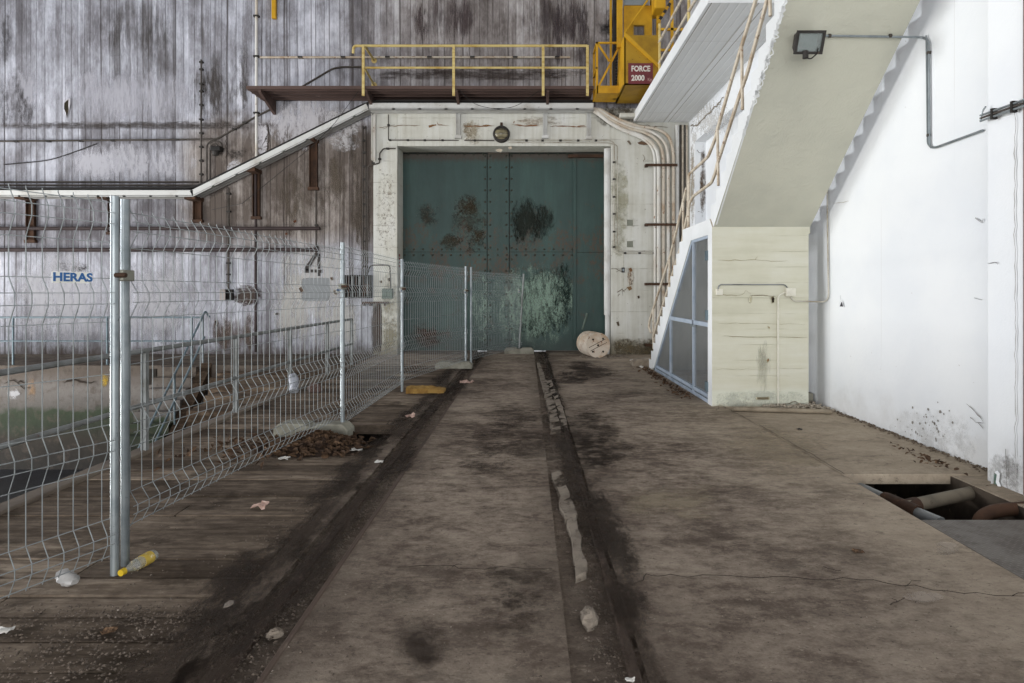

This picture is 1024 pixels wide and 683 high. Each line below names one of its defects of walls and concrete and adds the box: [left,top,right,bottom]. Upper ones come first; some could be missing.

water stain [194,56,247,112]
crack [631,566,1018,605]